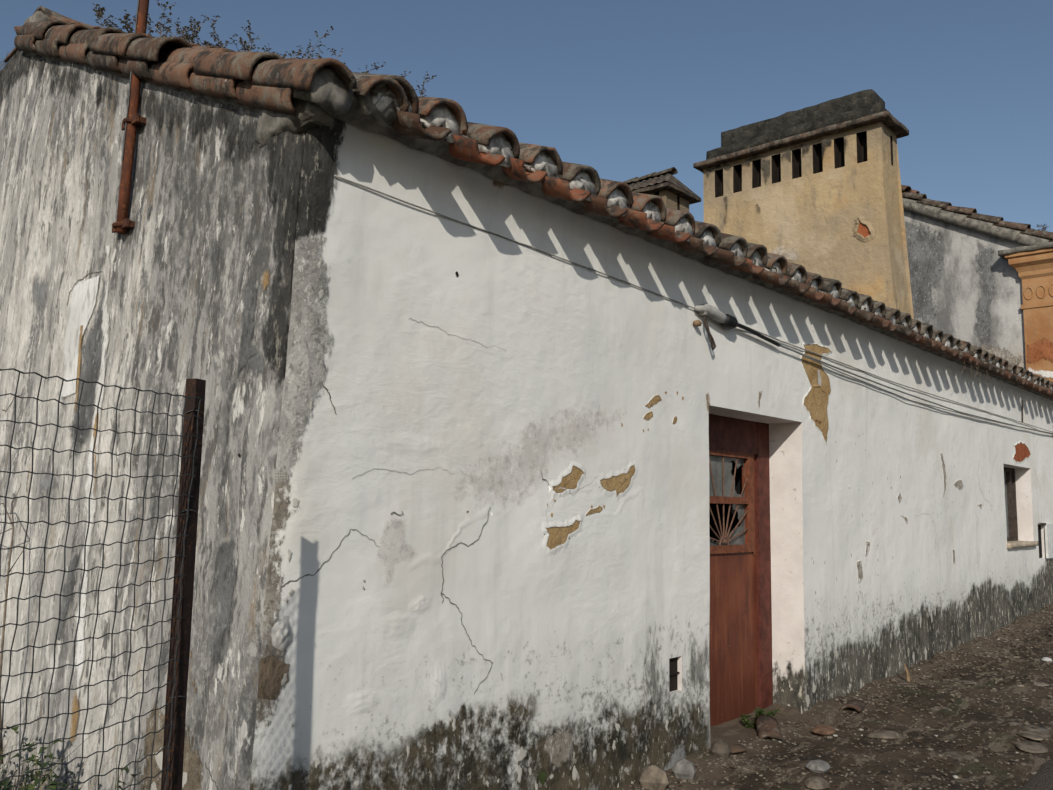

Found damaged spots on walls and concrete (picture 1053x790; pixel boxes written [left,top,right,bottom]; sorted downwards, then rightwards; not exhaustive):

damp [0,50,348,474]
damp [905,222,943,323]
damp [55,271,109,700]
flaking render [255,231,333,729]
crack [282,529,379,587]
crack [441,507,493,694]
damp [250,631,710,790]
flaking render [541,460,638,557]
flaking render [643,391,684,432]
flaking render [800,342,836,445]
damp [772,559,1053,714]
flaking render [1012,441,1031,464]